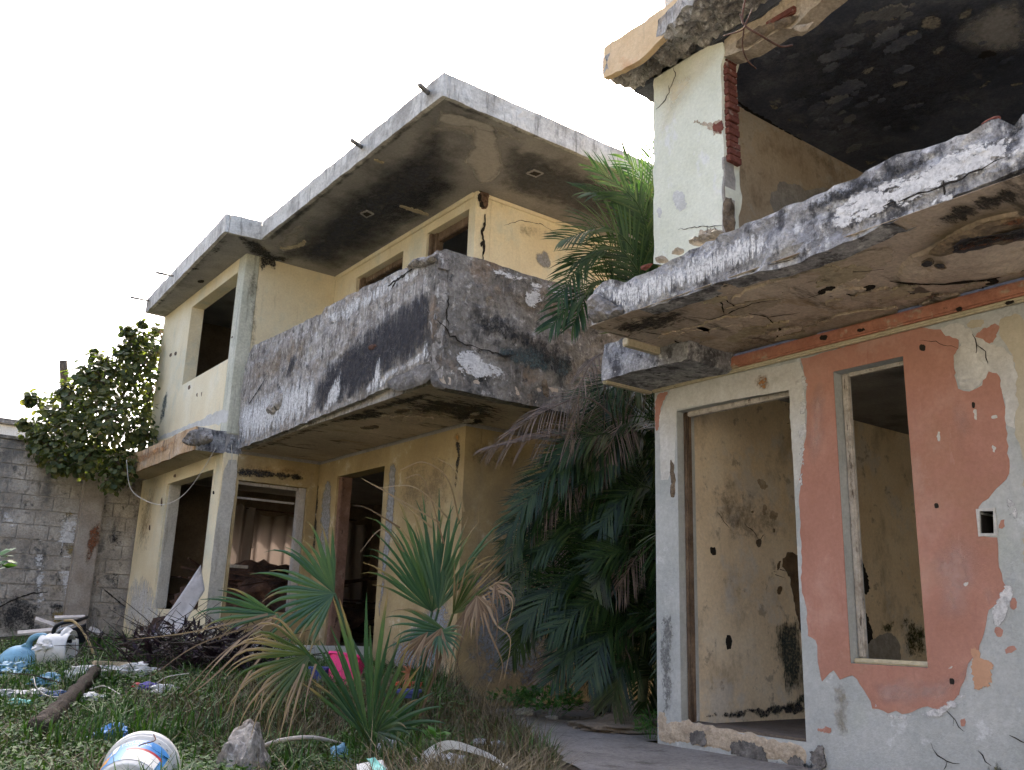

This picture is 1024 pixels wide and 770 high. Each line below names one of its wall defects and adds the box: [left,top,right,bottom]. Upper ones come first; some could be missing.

flaking render [694,0,813,167]
leakage [434,104,516,183]
crack [883,156,1008,207]
crack [480,214,553,259]
crack [438,297,516,358]
leakage [493,269,569,308]
peeling [586,216,1024,352]
crack [924,334,988,363]
leakage [257,291,503,486]
peeling [655,314,1024,726]
mould [708,618,805,718]
spalling [657,711,831,770]